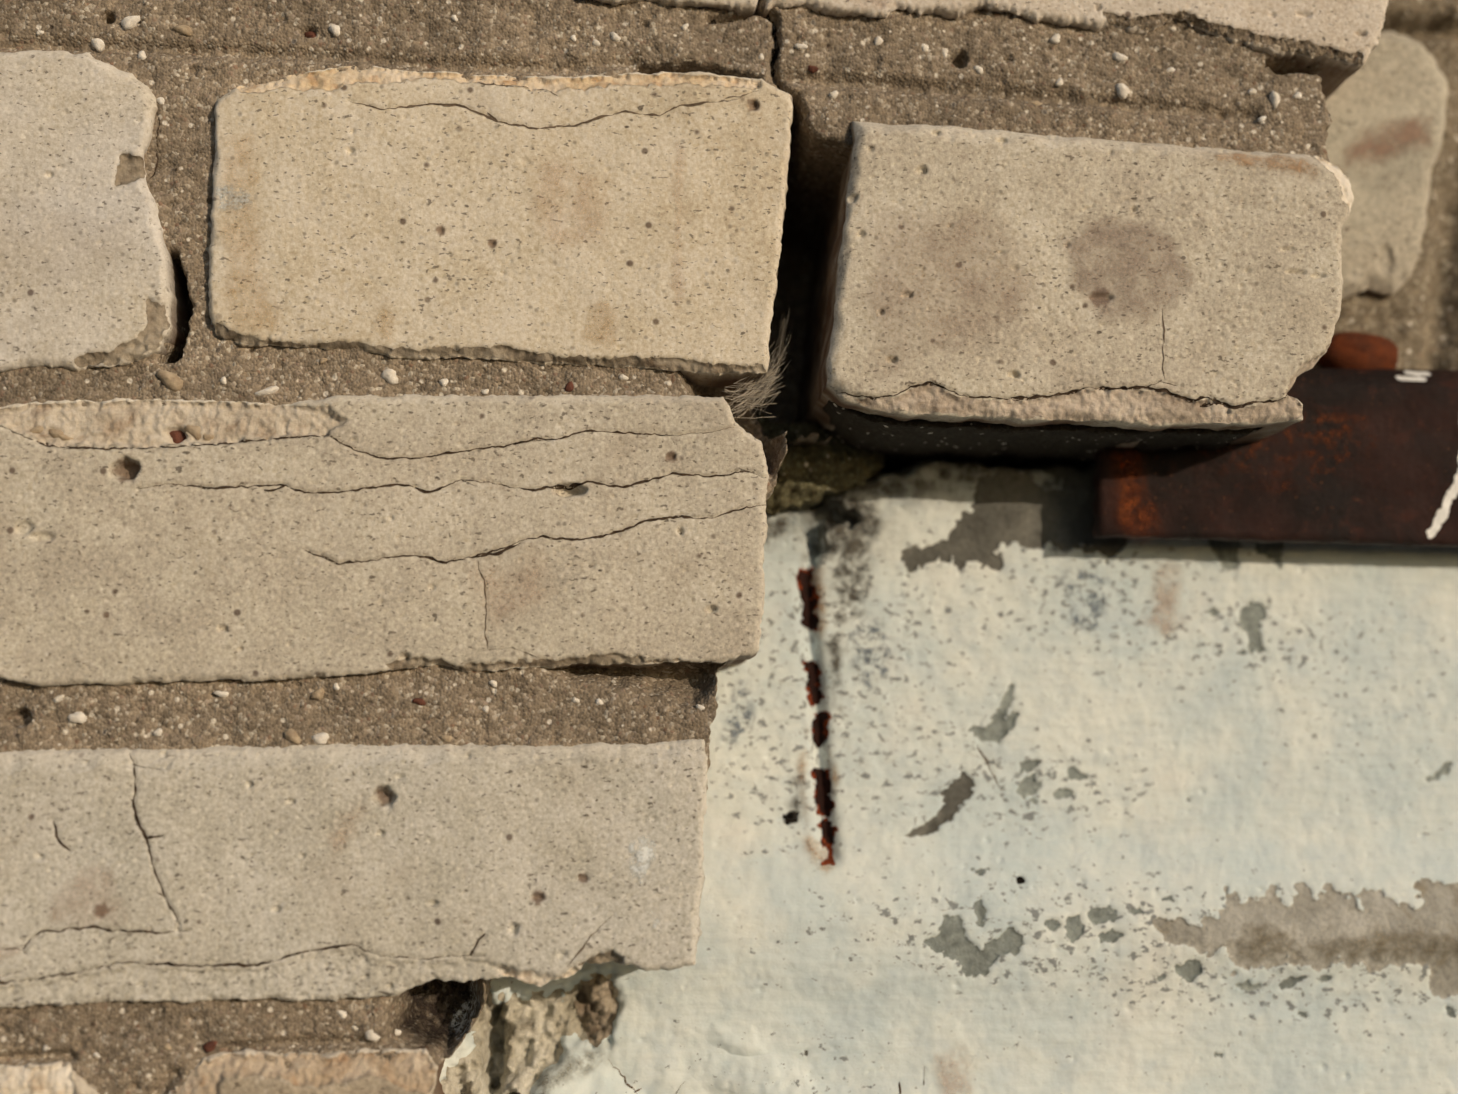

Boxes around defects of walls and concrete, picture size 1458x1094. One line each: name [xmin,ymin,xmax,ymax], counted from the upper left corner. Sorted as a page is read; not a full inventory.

crack [350,0,780,129]
crack [1,426,763,657]
peeling [901,465,1130,578]
corrosion [796,566,823,632]
corrosion [802,660,832,749]
crack [0,754,485,985]
corrosion [800,763,838,868]
peeling [905,772,976,837]
peeling [923,898,1026,978]
peeling [1044,878,1458,1018]
spalling [0,947,623,1094]
crack [610,1062,680,1094]